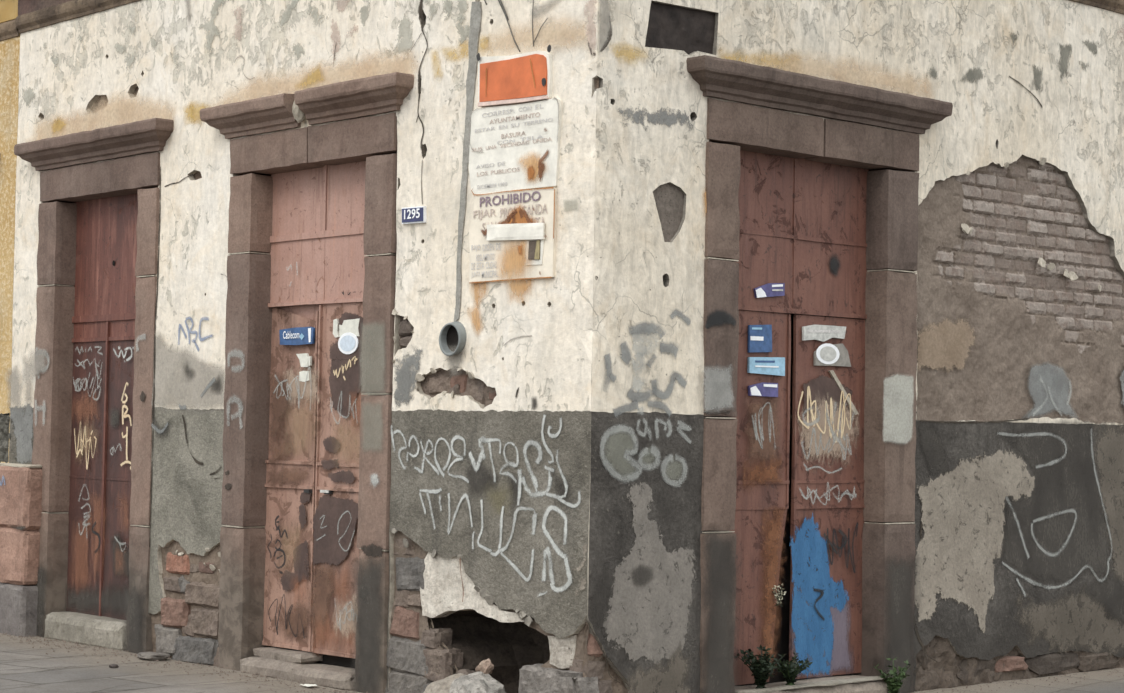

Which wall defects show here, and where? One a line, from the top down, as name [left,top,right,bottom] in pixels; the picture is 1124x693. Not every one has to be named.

spalling [92,96,108,114]
crack [410,0,428,204]
rust [521,150,549,181]
rust [472,283,486,331]
rust [502,242,541,296]
rust [501,206,546,237]
flaking render [415,367,497,407]
flaking render [916,156,1124,583]
flaking render [151,541,221,667]
flaking render [361,481,696,693]
peeling [914,450,1035,633]
flaking render [914,585,1124,691]